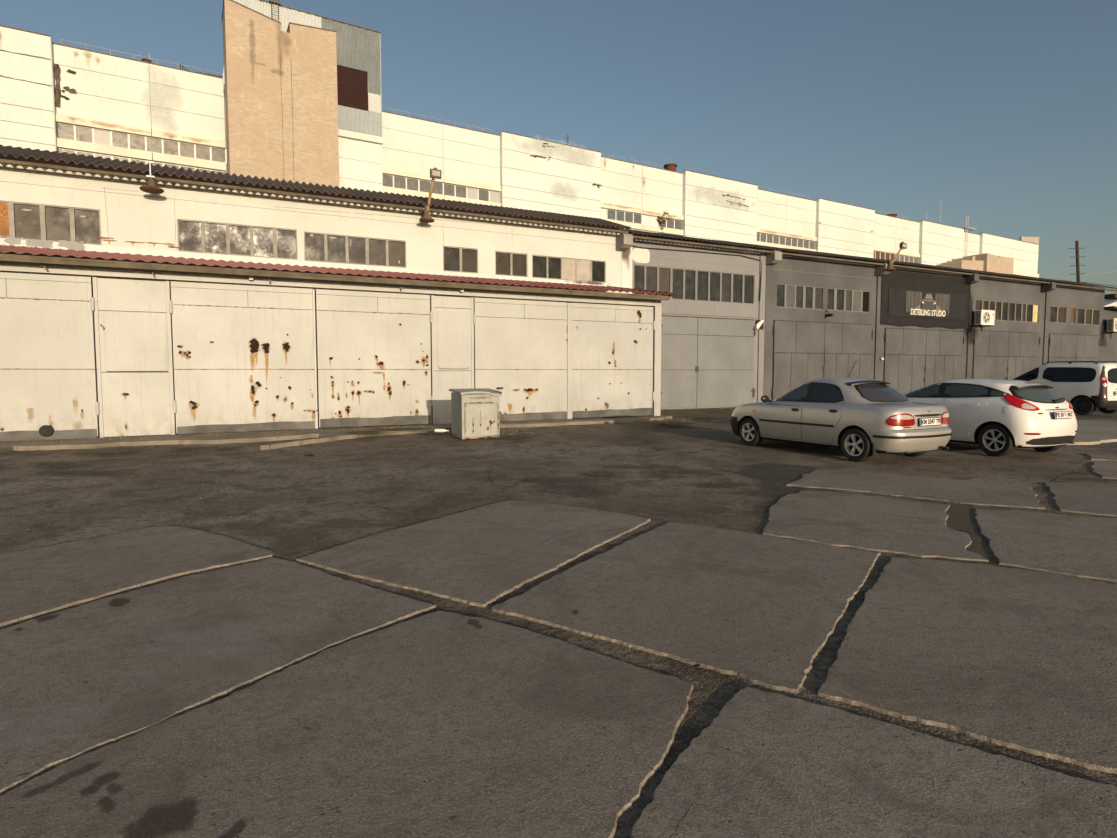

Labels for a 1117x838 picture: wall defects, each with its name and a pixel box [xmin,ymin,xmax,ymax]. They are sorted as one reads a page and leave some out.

spalling [54,64,76,107]
corrosion [249,334,429,420]
corrosion [465,387,538,439]
spalling [944,503,994,558]